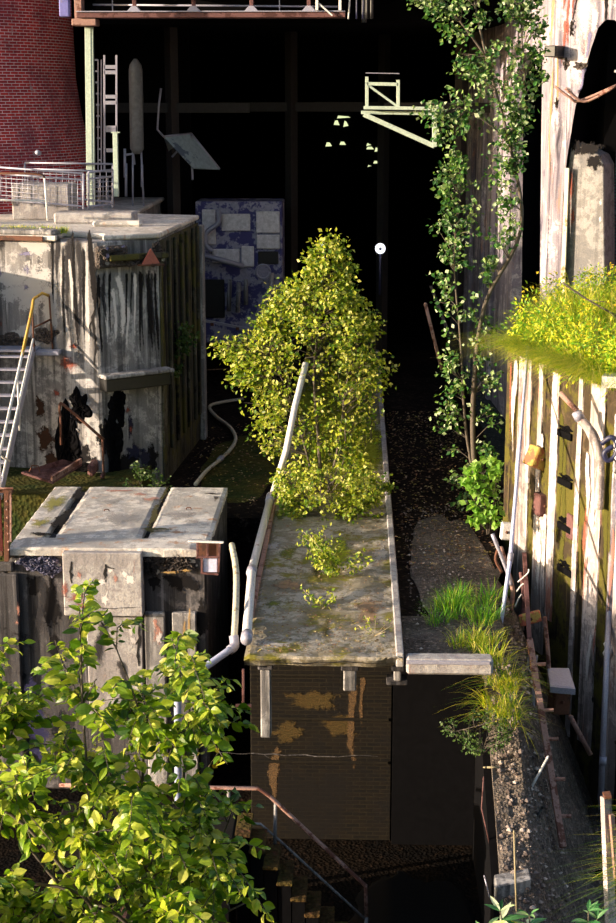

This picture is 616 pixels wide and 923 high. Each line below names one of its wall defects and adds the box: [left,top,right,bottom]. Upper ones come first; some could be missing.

rust [563,0,574,48]
crack [602,0,610,21]
damp [51,230,192,381]